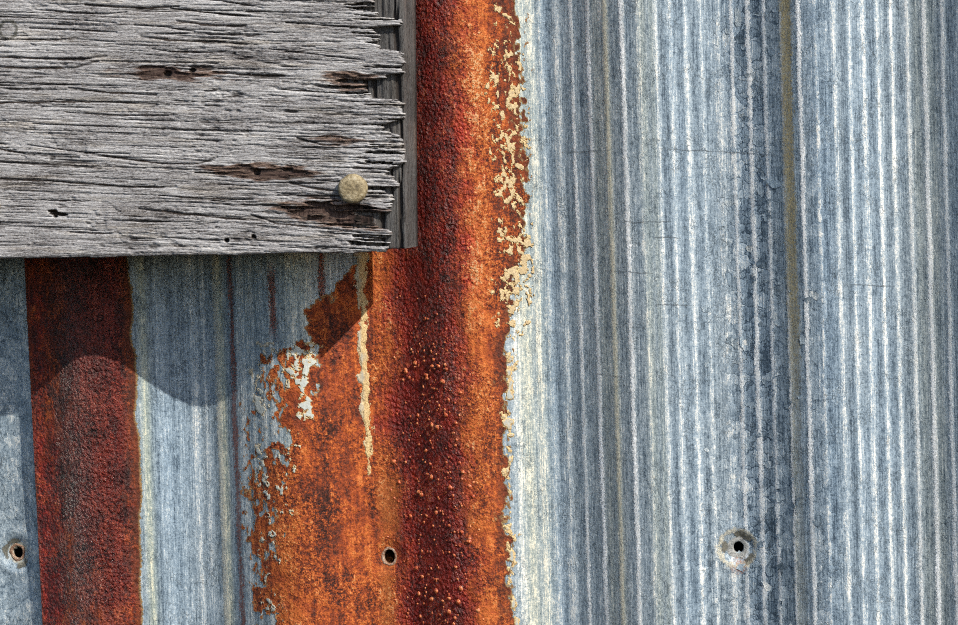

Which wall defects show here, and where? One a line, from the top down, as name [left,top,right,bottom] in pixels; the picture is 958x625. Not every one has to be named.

corrosion [24,256,144,625]
peeling [248,341,317,564]
corrosion [227,0,533,625]